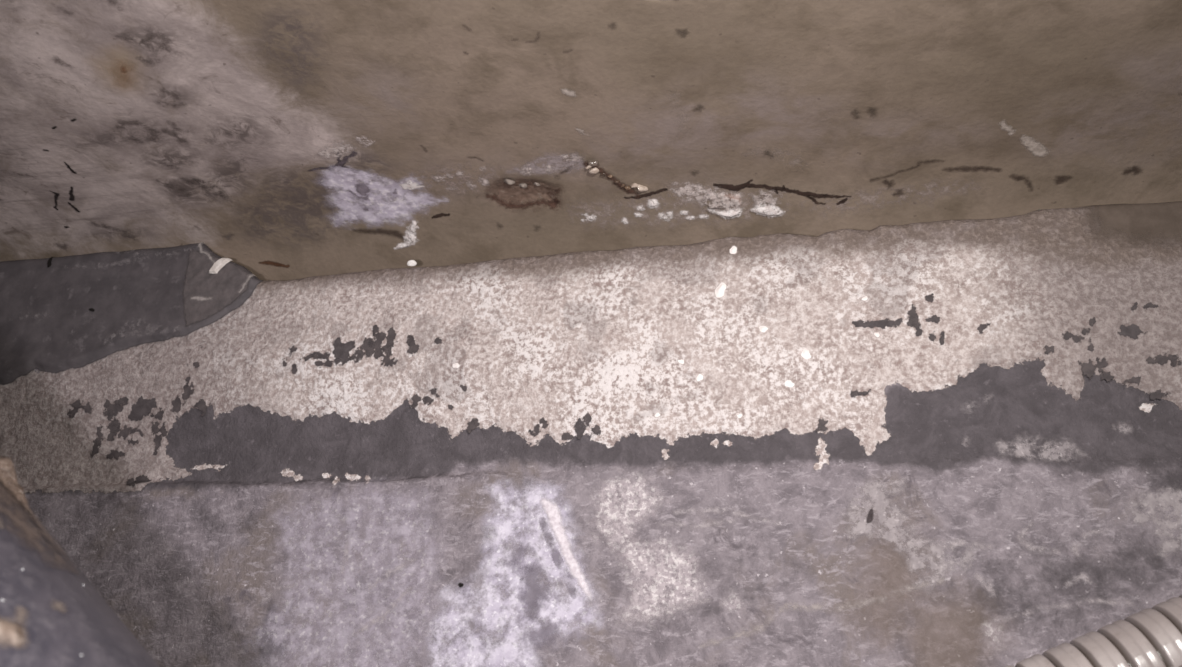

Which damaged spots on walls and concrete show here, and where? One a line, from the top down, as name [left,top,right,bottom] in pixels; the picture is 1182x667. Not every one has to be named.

damp [53,162,80,212]
damp [318,136,495,249]
damp [515,155,584,175]
damp [577,182,786,224]
flaking render [0,206,1182,494]
damp [256,485,595,667]